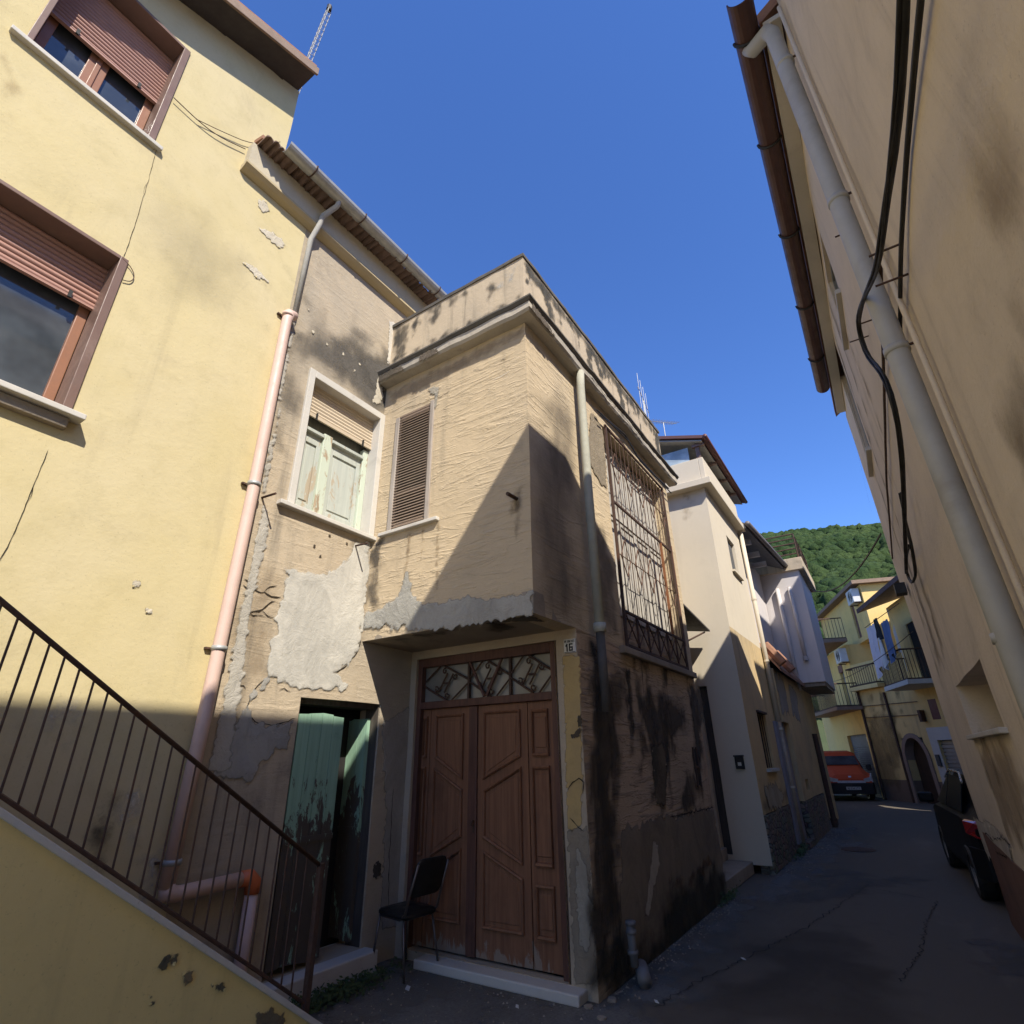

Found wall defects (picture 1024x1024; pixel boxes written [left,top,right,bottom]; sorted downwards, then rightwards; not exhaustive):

crack [0,451,48,559]
spalling [487,615,544,624]
leakage [587,641,726,992]
peeling [575,848,590,952]
spalling [158,953,193,986]